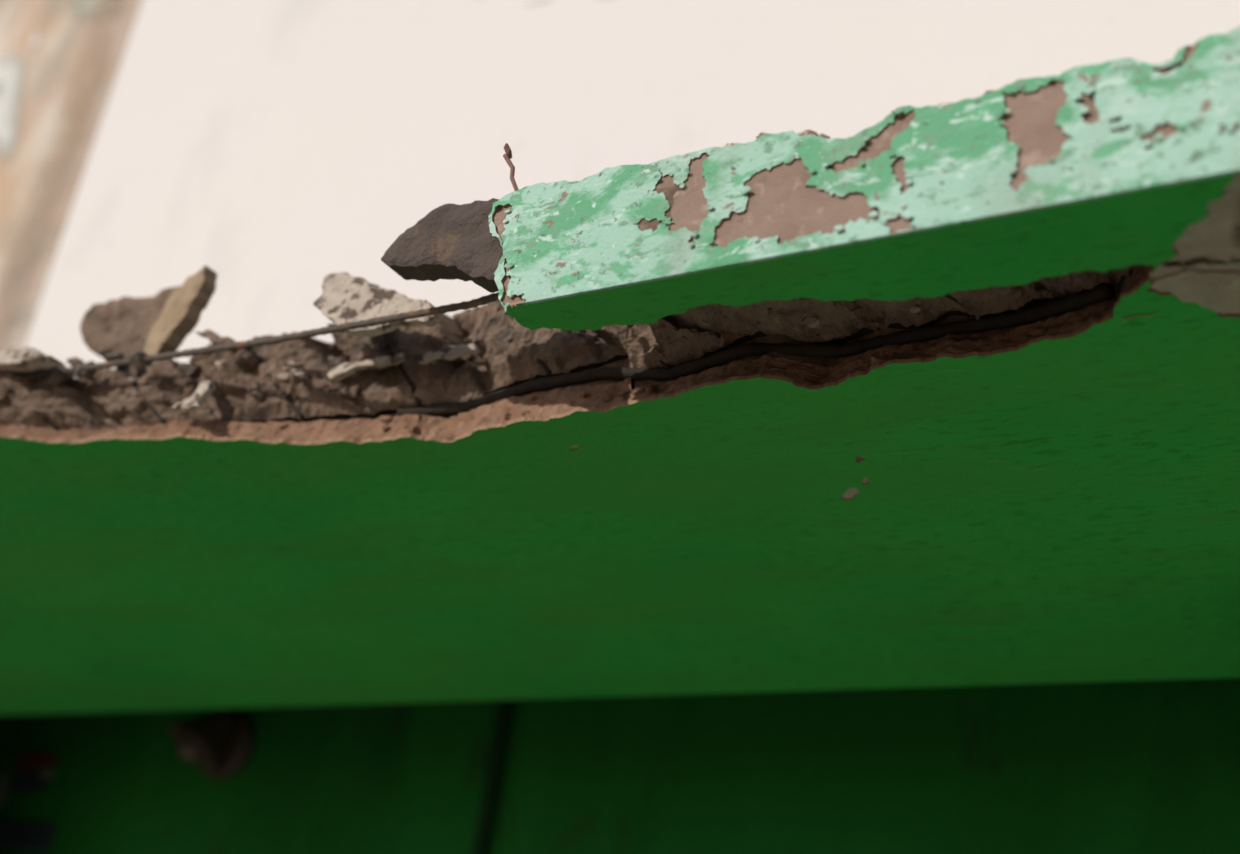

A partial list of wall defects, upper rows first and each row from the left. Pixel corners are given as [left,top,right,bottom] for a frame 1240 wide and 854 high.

peeling [1154,44,1198,75]
peeling [654,107,916,248]
peeling [996,75,1129,191]
peeling [1141,124,1185,148]
spalling [0,172,1240,444]